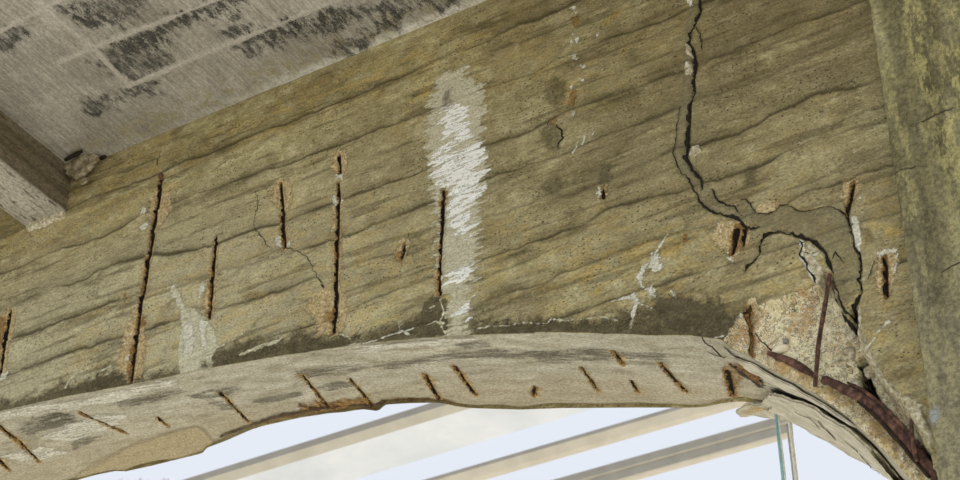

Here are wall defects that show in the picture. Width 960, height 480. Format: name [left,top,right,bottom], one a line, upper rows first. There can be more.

leakage [57,0,461,117]
crack [672,0,876,320]
corrosion [220,397,463,438]
leakage [296,234,743,391]
spalling [721,267,938,480]